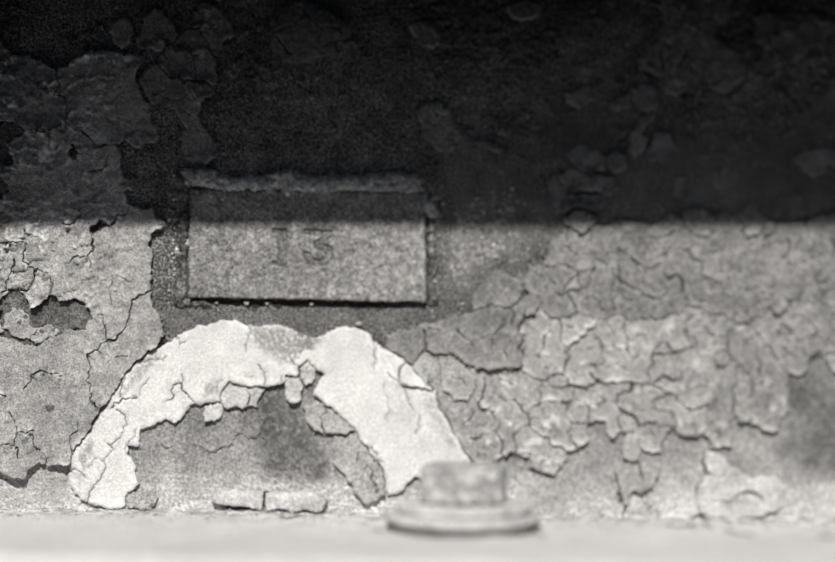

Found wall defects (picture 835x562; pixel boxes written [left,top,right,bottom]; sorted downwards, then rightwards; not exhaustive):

peeling [109,17,134,49]
peeling [136,2,239,164]
peeling [0,41,166,480]
crack [63,205,134,258]
crack [207,220,430,309]
crack [88,290,152,357]
peeling [68,202,835,519]
crack [398,213,835,482]
crack [211,491,323,518]
crack [613,470,626,517]
crack [662,454,760,536]